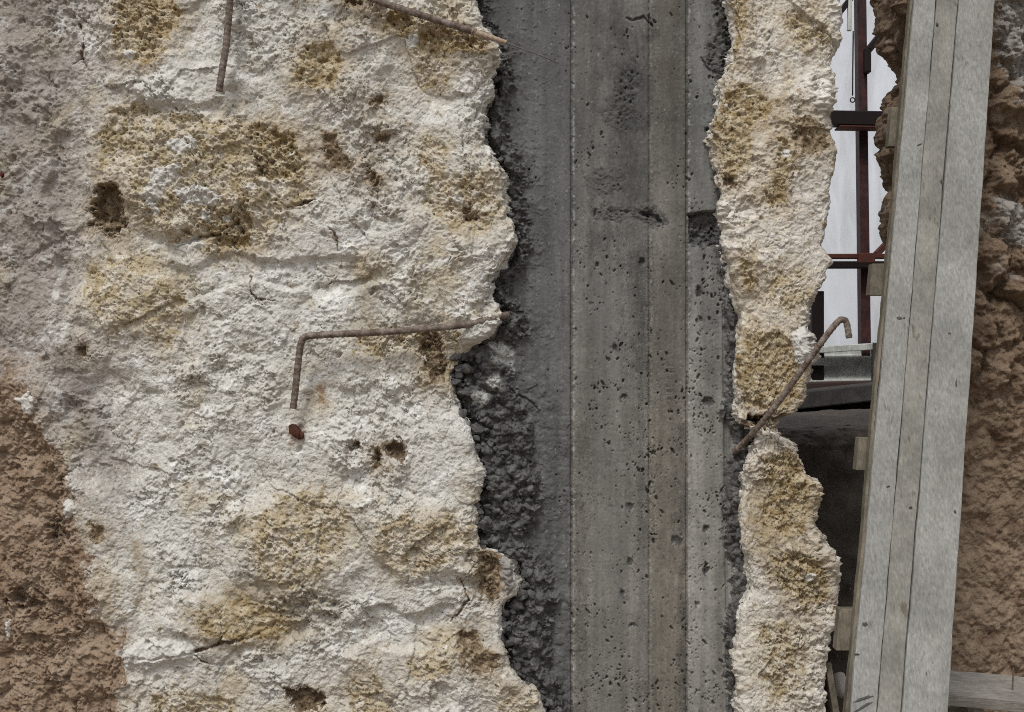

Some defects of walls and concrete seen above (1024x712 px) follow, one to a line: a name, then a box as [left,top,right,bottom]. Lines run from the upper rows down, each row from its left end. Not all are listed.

spalling [702,0,750,71]
spalling [596,55,651,140]
spalling [414,133,506,237]
spalling [583,166,669,229]
spalling [685,205,721,250]
spalling [0,361,131,712]
spalling [405,628,539,712]